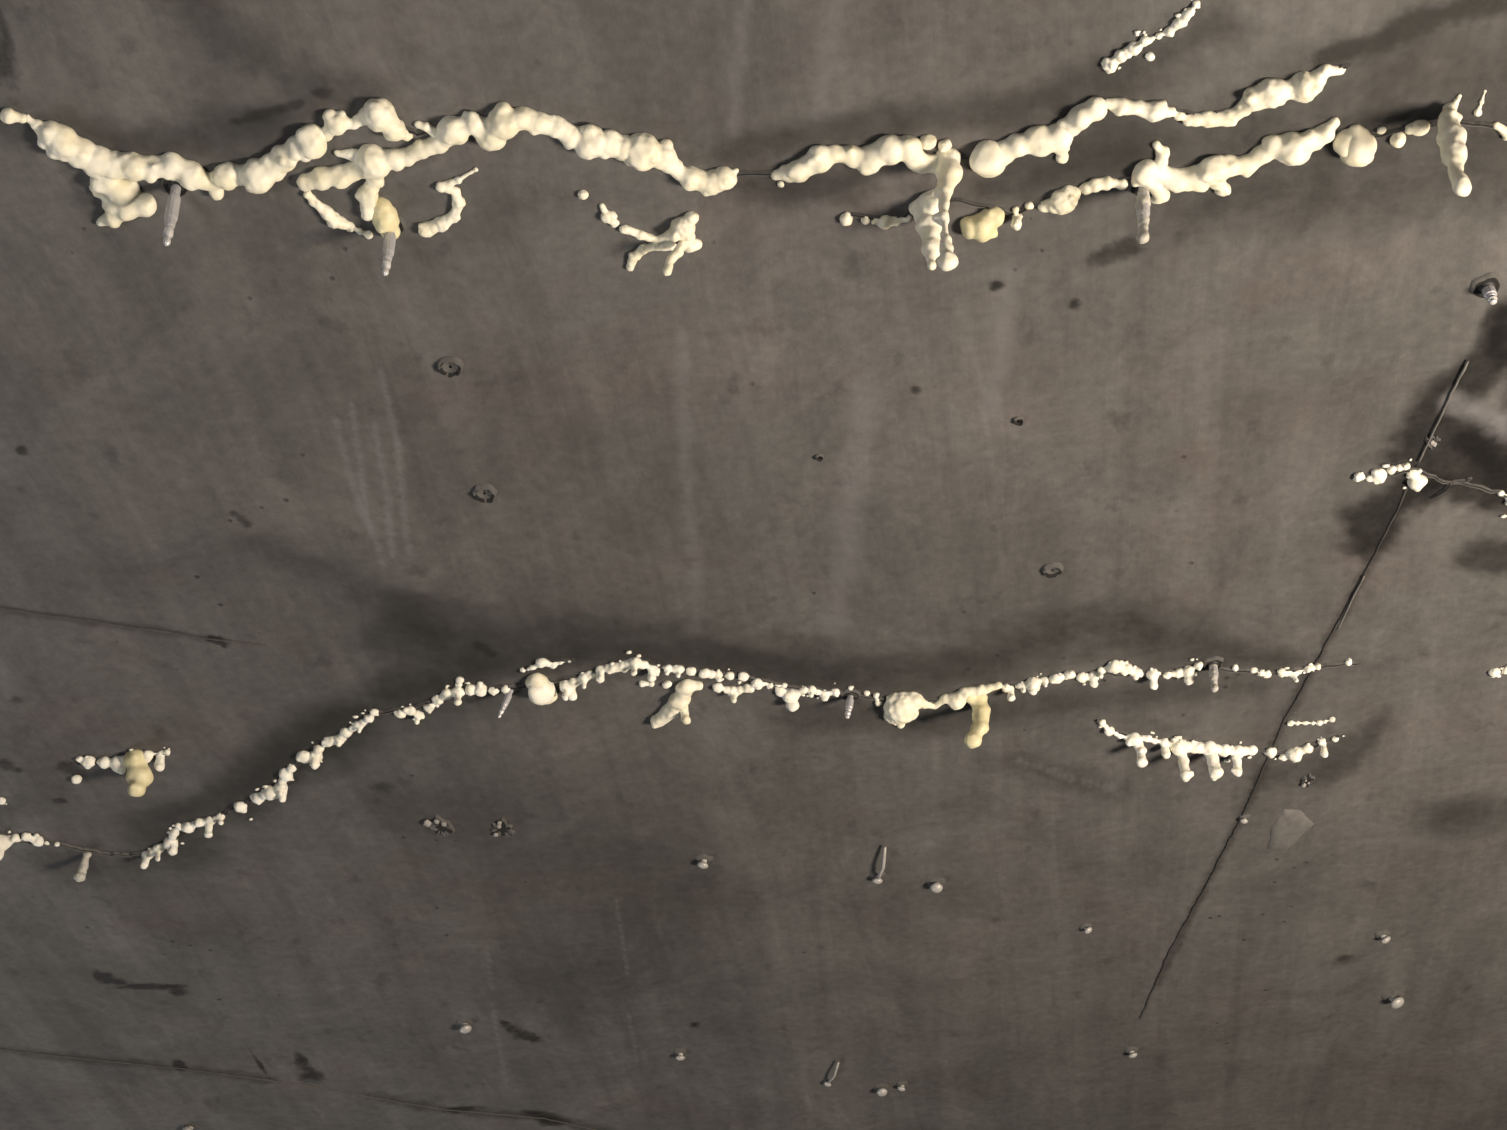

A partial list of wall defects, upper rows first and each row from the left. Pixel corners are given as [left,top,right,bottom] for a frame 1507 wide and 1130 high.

crack [1175,106,1234,115]
crack [405,126,437,146]
crack [1372,120,1507,138]
crack [923,150,971,160]
crack [850,209,910,220]
crack [950,198,1041,215]
water stain [1348,306,1507,555]
crack [1352,467,1507,499]
crack [1002,660,1361,686]
crack [924,695,939,703]
crack [1257,734,1339,754]
crack [14,657,886,857]